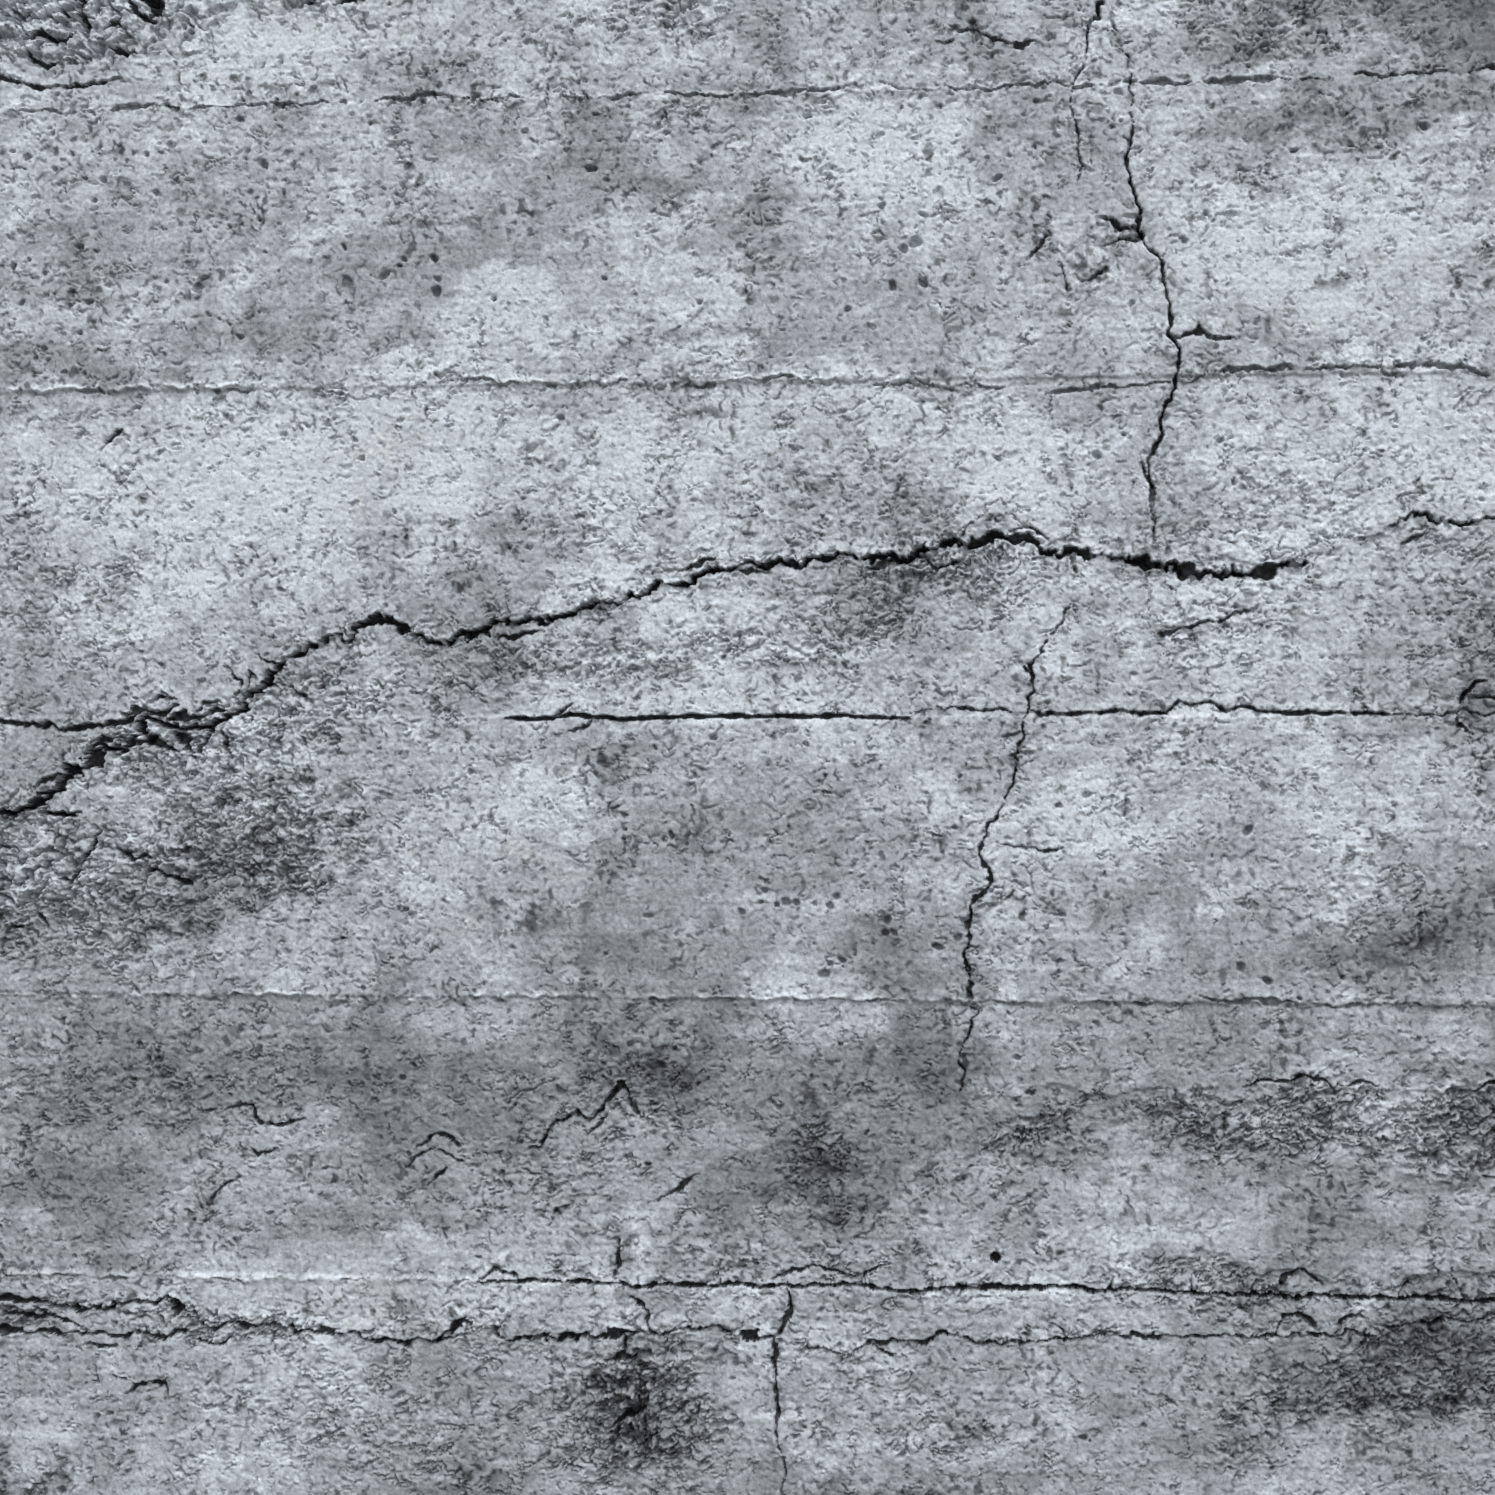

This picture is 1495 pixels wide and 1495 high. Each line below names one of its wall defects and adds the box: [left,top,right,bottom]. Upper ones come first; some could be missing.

crack [0,0,1495,1105]
crack [23,1236,1495,1495]